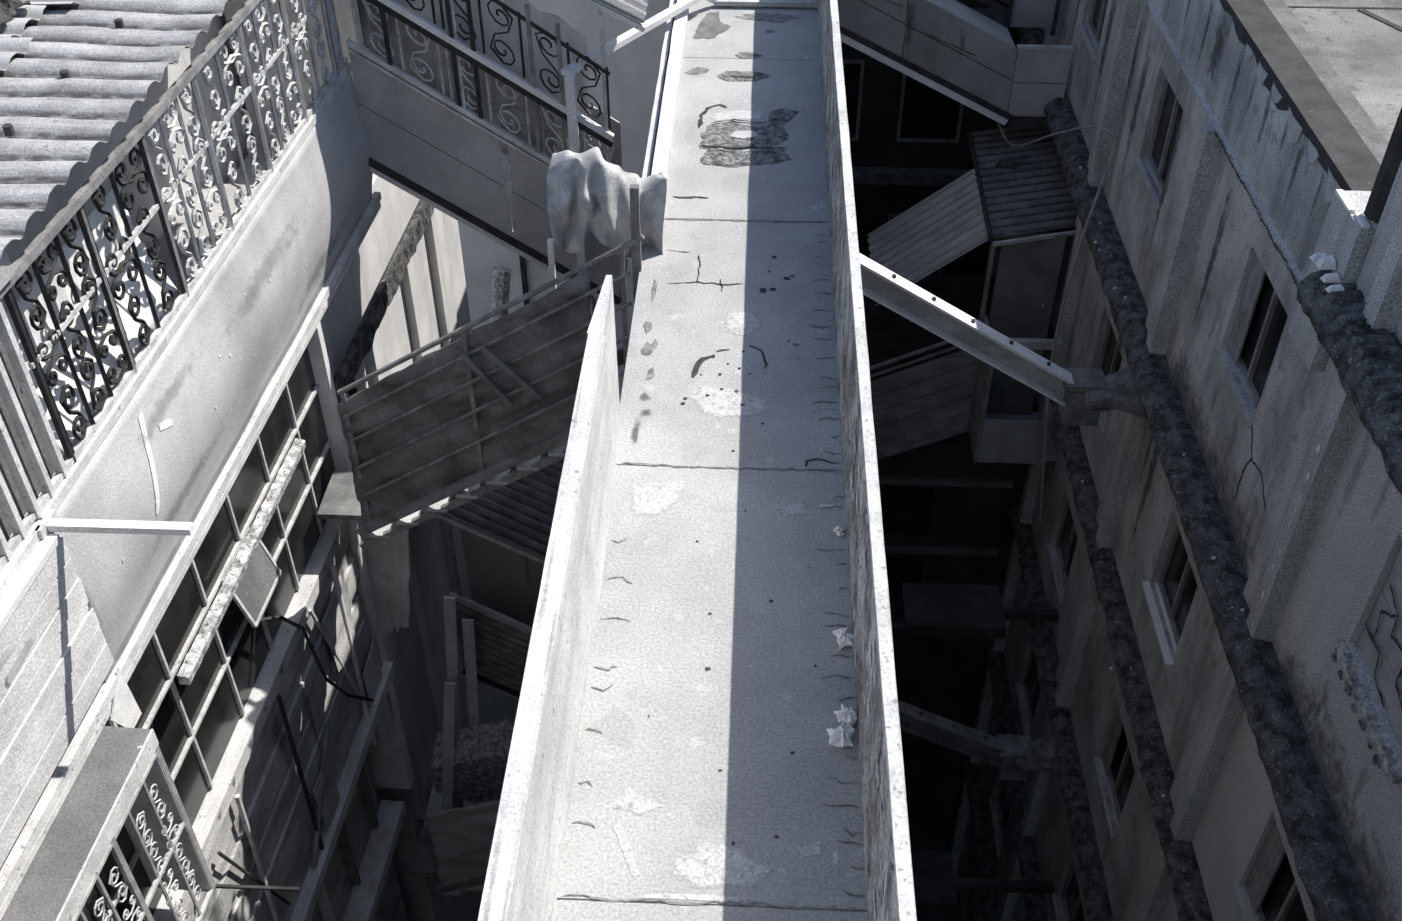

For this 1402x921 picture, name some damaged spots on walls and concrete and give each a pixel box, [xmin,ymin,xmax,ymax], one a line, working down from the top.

spalling [685,52,771,81]
spalling [698,104,798,167]
leakage [1095,0,1115,96]
leakage [1126,32,1145,146]
leakage [1201,18,1223,73]
leakage [1200,198,1228,299]
crack [622,196,854,701]
crack [1235,421,1265,509]
crack [591,666,618,691]
crack [562,756,865,911]